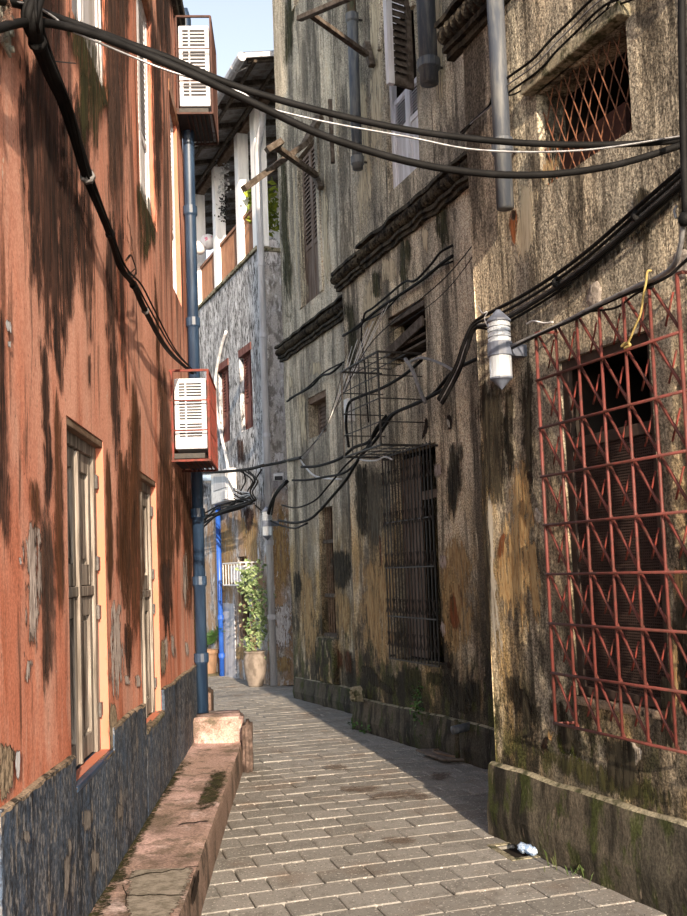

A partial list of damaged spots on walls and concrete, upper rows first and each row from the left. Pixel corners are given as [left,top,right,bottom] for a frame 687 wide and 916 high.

damp [283,0,294,67]
damp [279,156,293,322]
damp [19,0,172,693]
damp [0,310,11,563]
damp [354,464,390,552]
damp [445,442,463,523]
damp [475,364,533,652]
peeling [19,520,42,683]
peeling [108,600,141,751]
flaking render [672,644,681,707]
spalling [0,743,20,802]
damp [604,738,641,791]